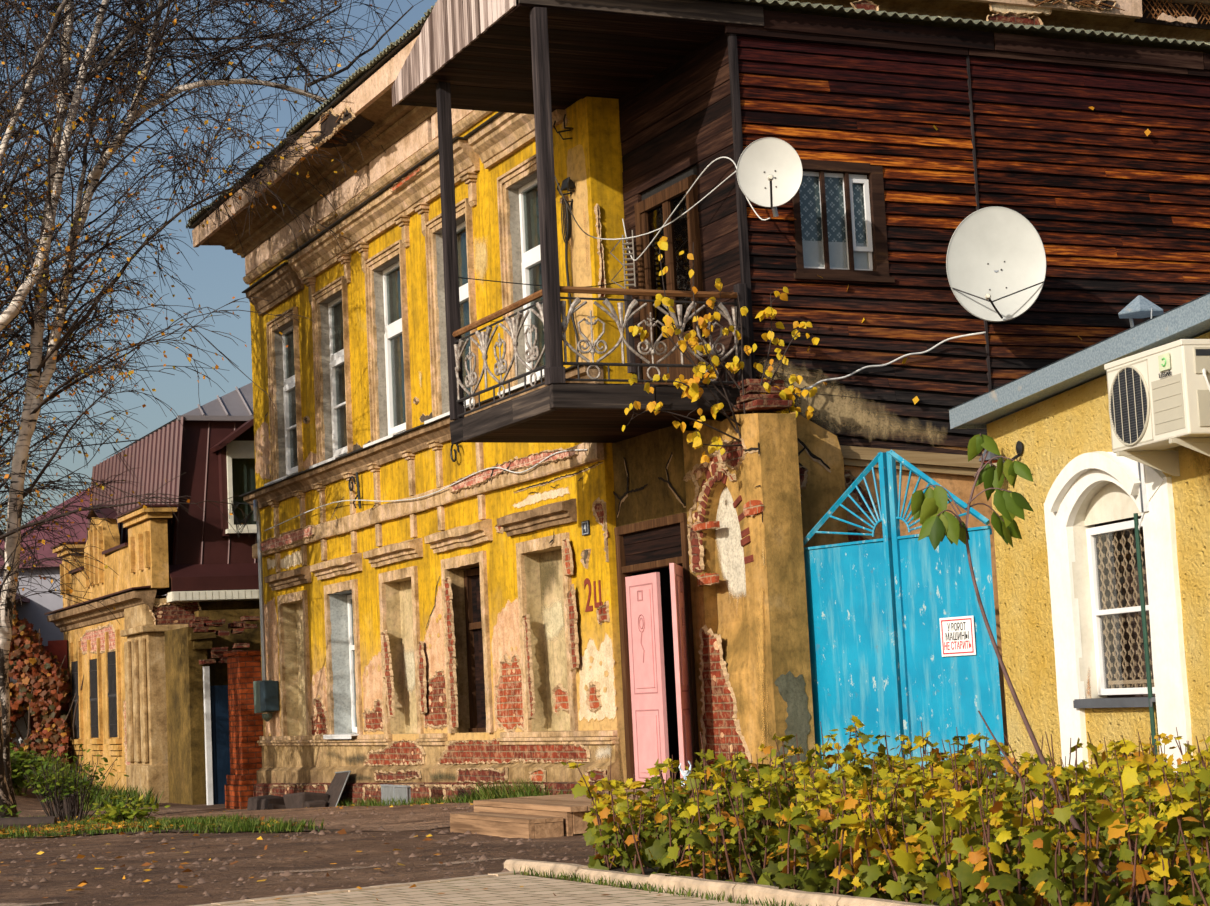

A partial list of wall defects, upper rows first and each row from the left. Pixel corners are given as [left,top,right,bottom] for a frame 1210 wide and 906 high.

spalling [986,3,1052,25]
spalling [449,448,578,494]
crack [489,452,686,518]
spalling [683,438,747,586]
spalling [743,500,764,517]
peeling [552,497,617,723]
spalling [362,577,607,805]
spalling [698,625,753,787]